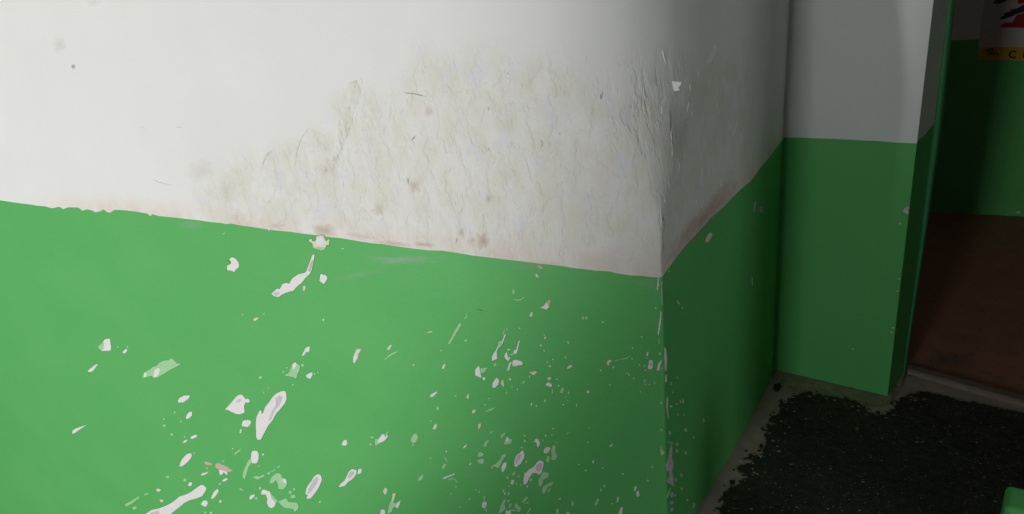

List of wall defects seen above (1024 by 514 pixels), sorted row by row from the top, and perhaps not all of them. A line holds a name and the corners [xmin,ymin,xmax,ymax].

peeling [226,257,240,273]
peeling [271,234,330,298]
peeling [98,338,128,353]
peeling [475,328,569,407]
flaking render [133,346,323,514]
flaking render [338,468,362,488]
peeling [369,432,389,446]
flaking render [454,394,569,514]
spalling [660,431,683,511]